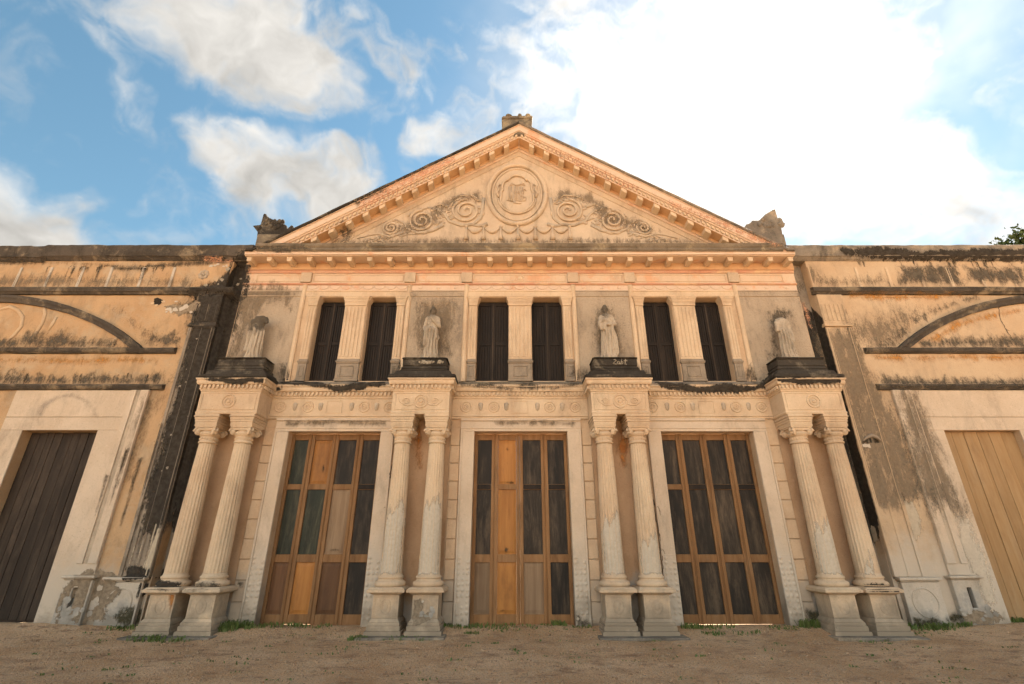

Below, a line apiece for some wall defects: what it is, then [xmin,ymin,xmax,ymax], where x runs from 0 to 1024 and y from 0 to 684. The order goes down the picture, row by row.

damp [840,246,1024,285]
spalling [151,298,200,317]
damp [854,305,948,347]
damp [882,374,1024,390]
damp [0,246,307,591]
spalling [55,569,122,624]